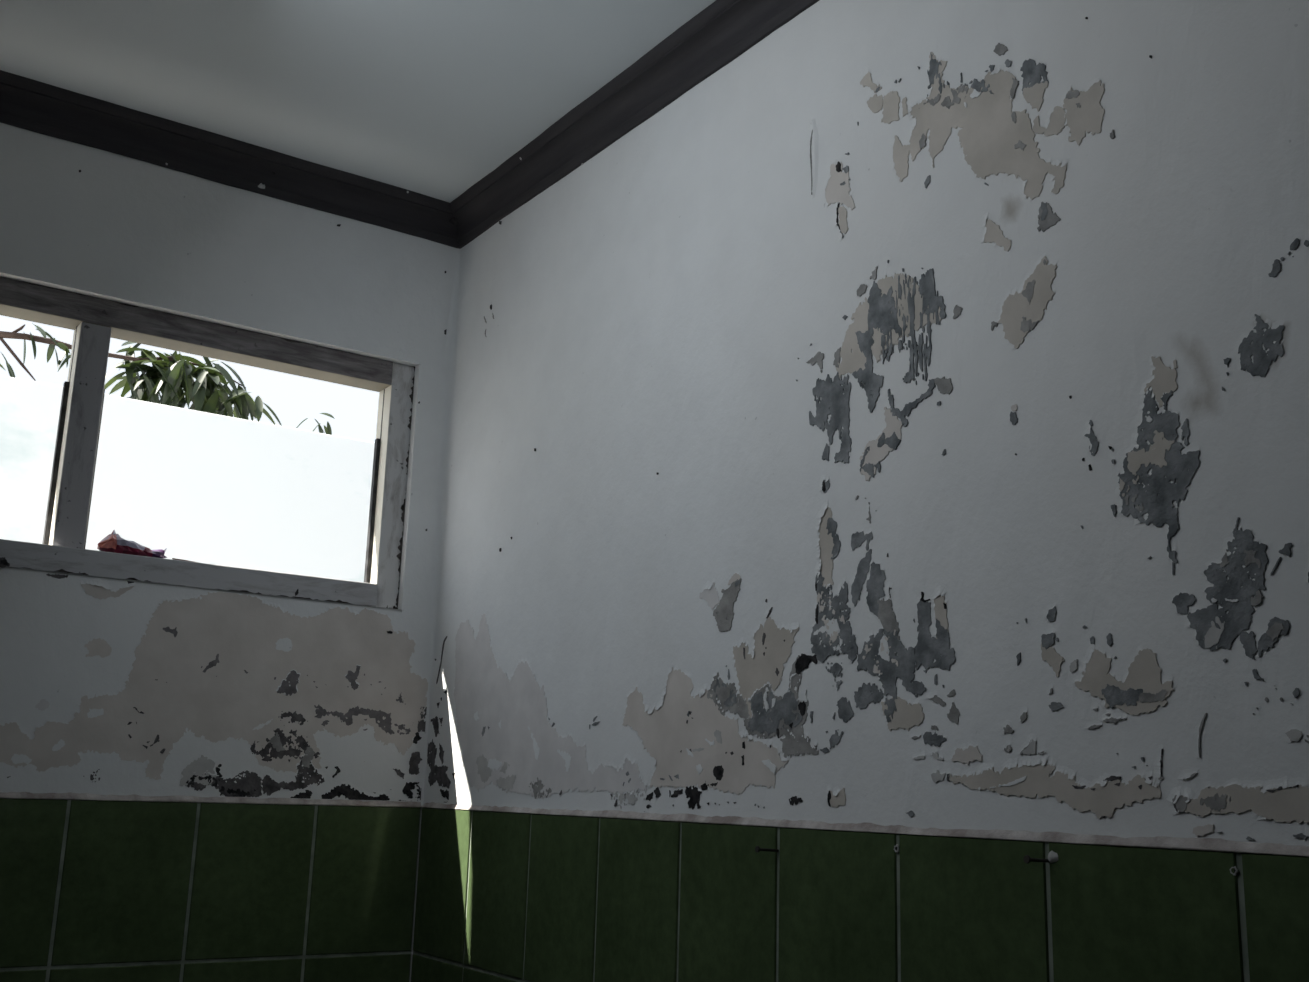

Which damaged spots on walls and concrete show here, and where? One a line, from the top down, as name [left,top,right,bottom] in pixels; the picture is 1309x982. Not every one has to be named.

peeling [857,43,1115,251]
peeling [1268,238,1309,278]
peeling [453,253,1309,840]
peeling [0,591,429,782]